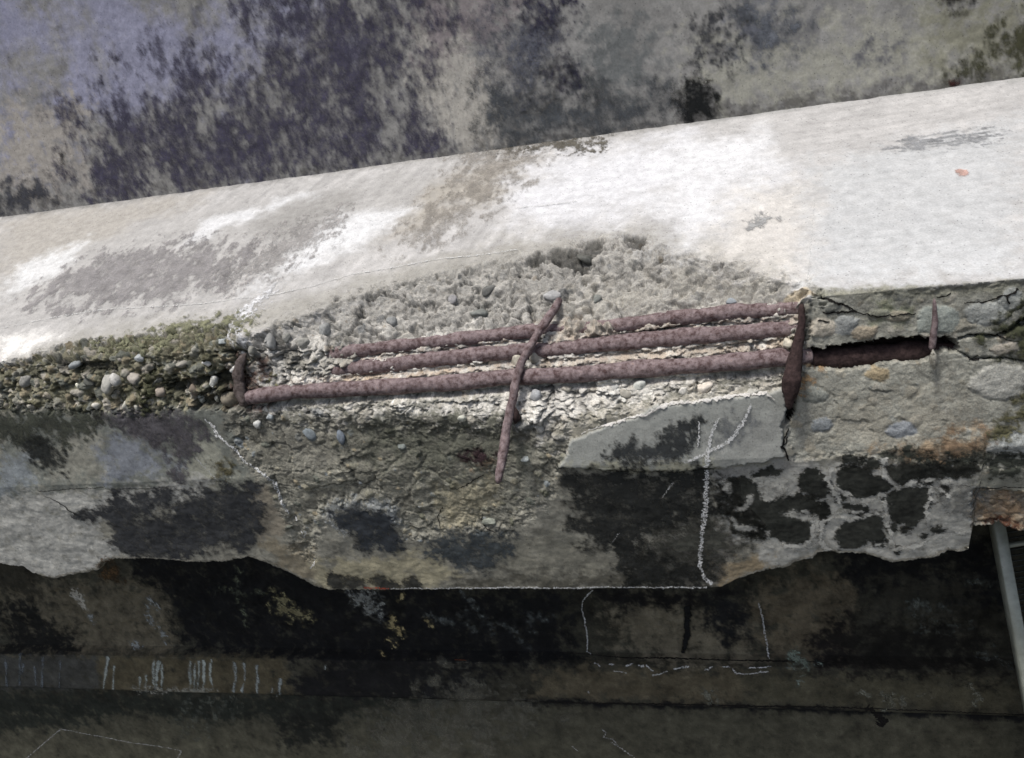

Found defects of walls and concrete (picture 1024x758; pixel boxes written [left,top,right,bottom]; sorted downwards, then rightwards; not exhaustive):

water stain [944,19,1024,83]
water stain [54,0,801,249]
water stain [884,126,1002,150]
water stain [0,176,59,216]
crack [937,288,1024,361]
rust [228,353,271,412]
spalling [0,226,1024,589]
water stain [0,403,267,562]
rust [457,446,498,471]
water stain [877,442,1024,515]
water stain [322,493,406,556]
water stain [423,527,519,577]